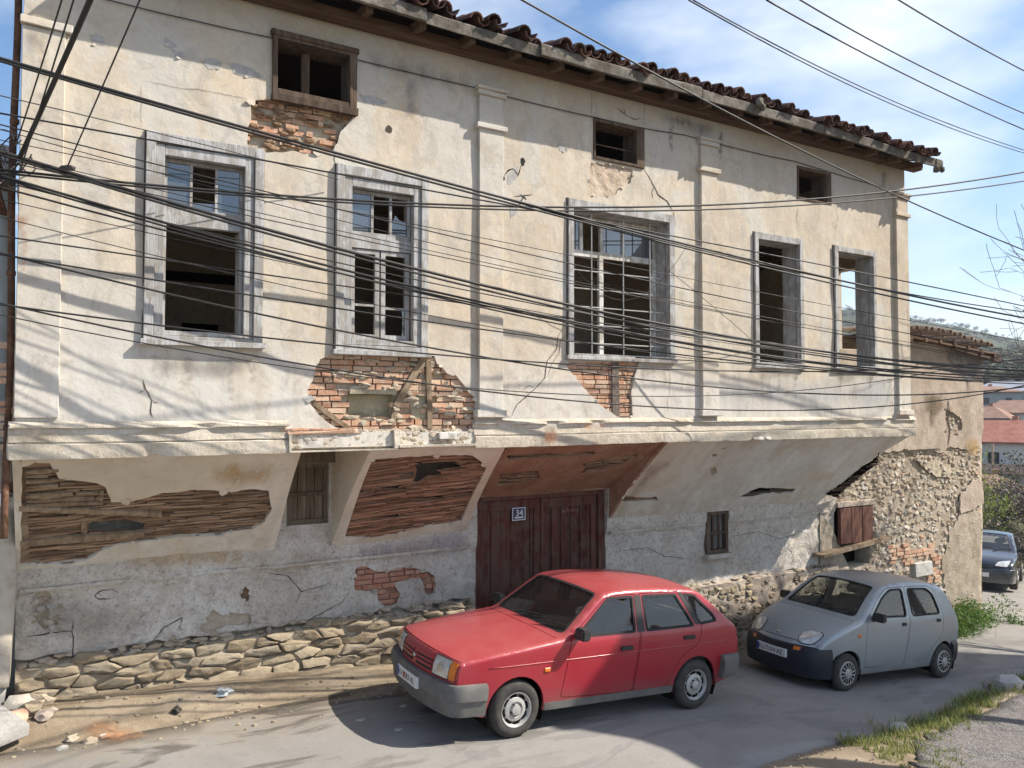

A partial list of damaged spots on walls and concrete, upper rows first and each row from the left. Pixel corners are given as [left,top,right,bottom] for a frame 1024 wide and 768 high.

flaking render [246,98,352,157]
flaking render [588,161,634,197]
crack [514,329,564,410]
flaking render [563,360,641,418]
flaking render [279,353,487,540]
flaking render [826,452,881,497]
flaking render [913,454,954,478]
flaking render [19,460,272,568]
flaking render [887,543,944,583]
crack [270,573,348,619]
flaking render [351,566,436,607]
crack [28,621,75,657]